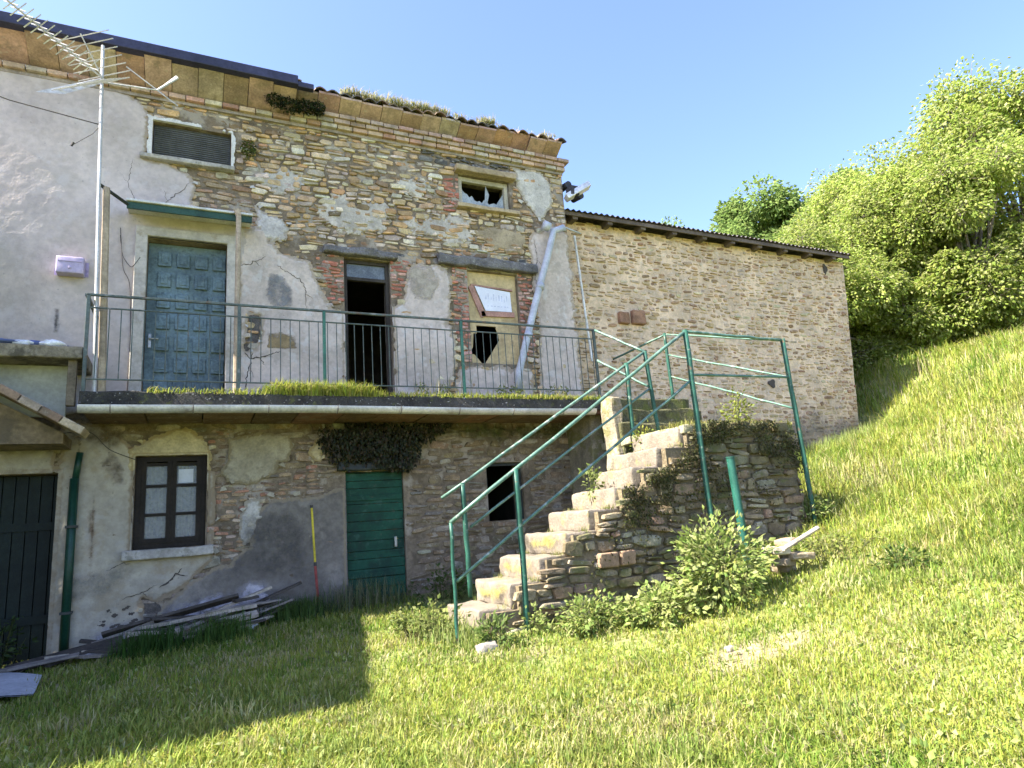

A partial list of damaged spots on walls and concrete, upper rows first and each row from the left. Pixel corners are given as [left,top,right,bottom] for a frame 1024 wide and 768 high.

crack [241,256,313,308]
spalling [244,315,263,352]
flaking render [128,427,329,561]
crack [122,568,185,600]